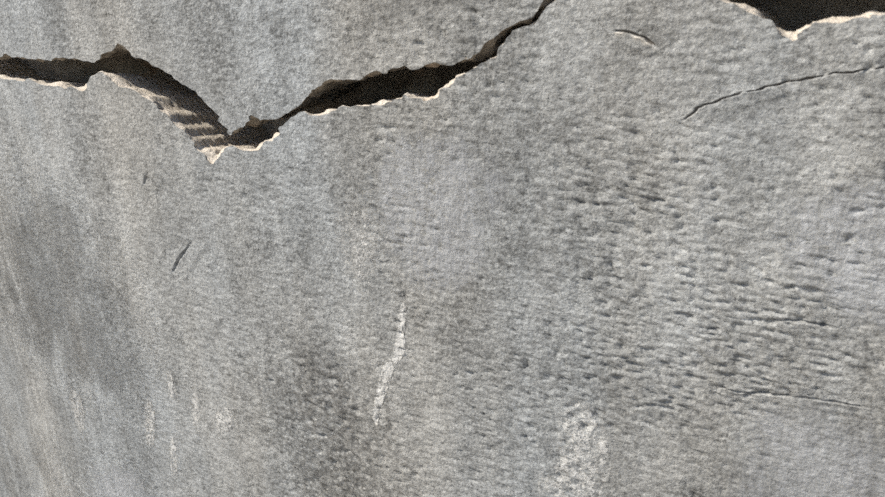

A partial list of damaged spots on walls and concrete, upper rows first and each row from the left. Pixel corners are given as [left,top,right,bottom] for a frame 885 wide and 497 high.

crack [599,17,674,57]
crack [721,0,885,41]
crack [0,0,556,164]
crack [667,55,885,130]